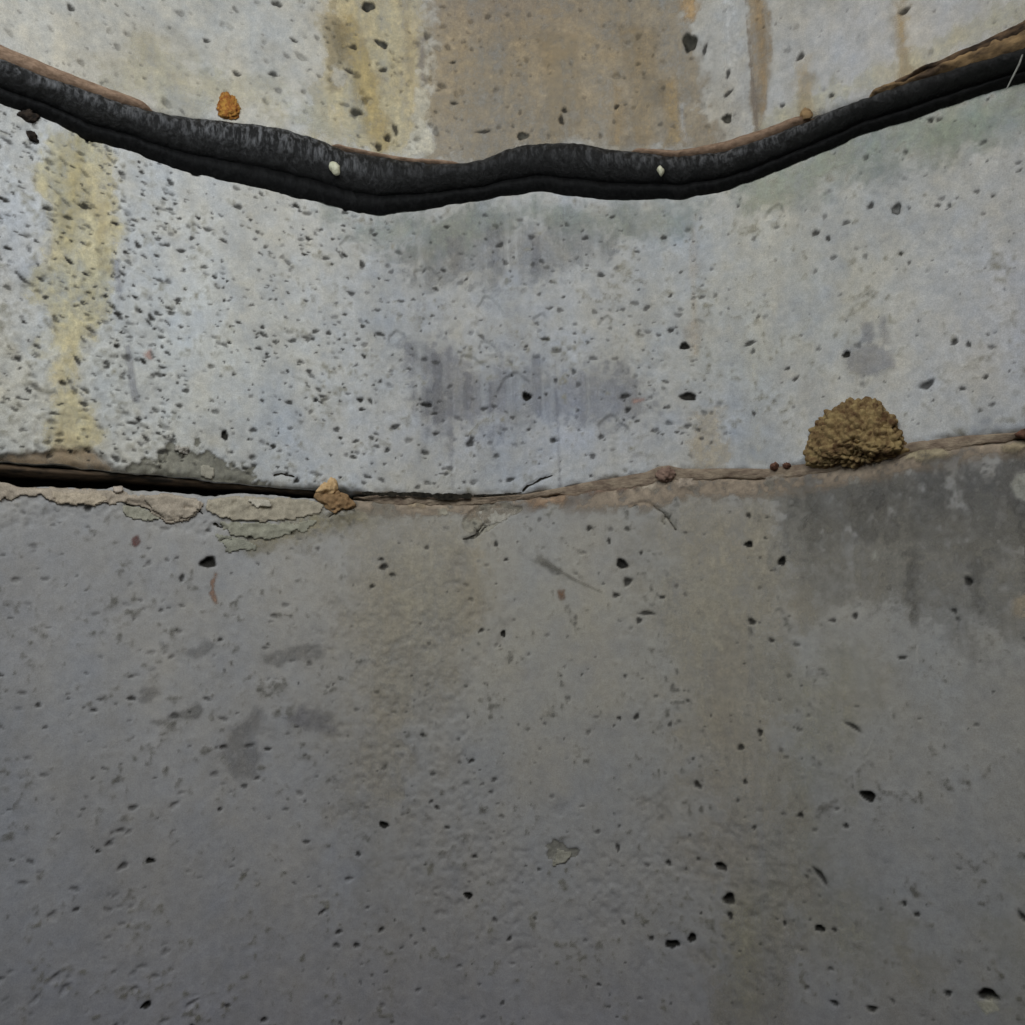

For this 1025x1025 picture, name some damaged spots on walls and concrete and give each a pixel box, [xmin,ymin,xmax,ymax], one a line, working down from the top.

damp [406,87,434,155]
damp [126,346,138,402]
peeling [0,438,324,553]
damp [776,450,1025,633]